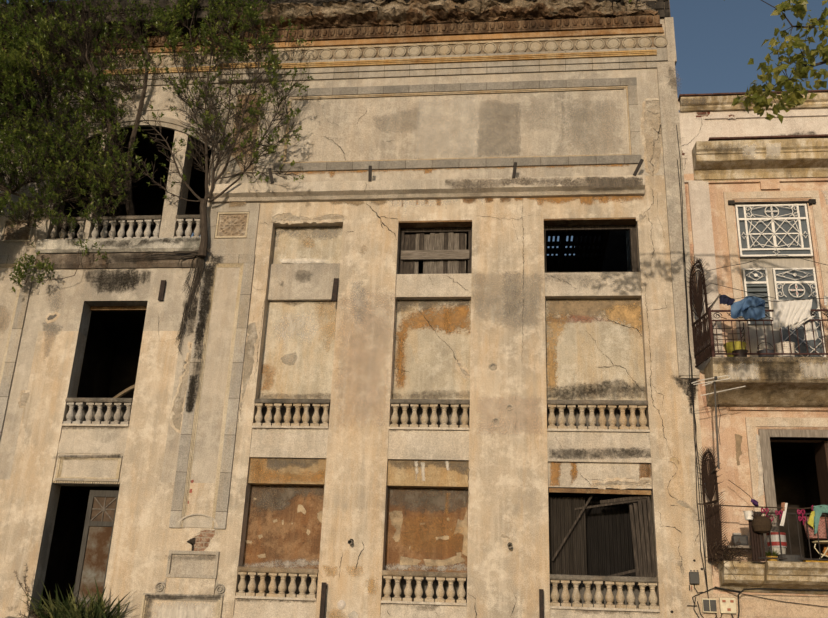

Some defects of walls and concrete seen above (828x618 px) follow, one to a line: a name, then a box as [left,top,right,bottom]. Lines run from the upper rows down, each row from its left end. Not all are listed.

water stain [86,239,183,292]
crack [586,110,671,452]
water stain [178,256,222,412]
water stain [548,382,646,400]
spalling [185,528,218,556]
peeling [389,510,403,542]
peeling [400,510,468,566]
crack [659,473,699,569]